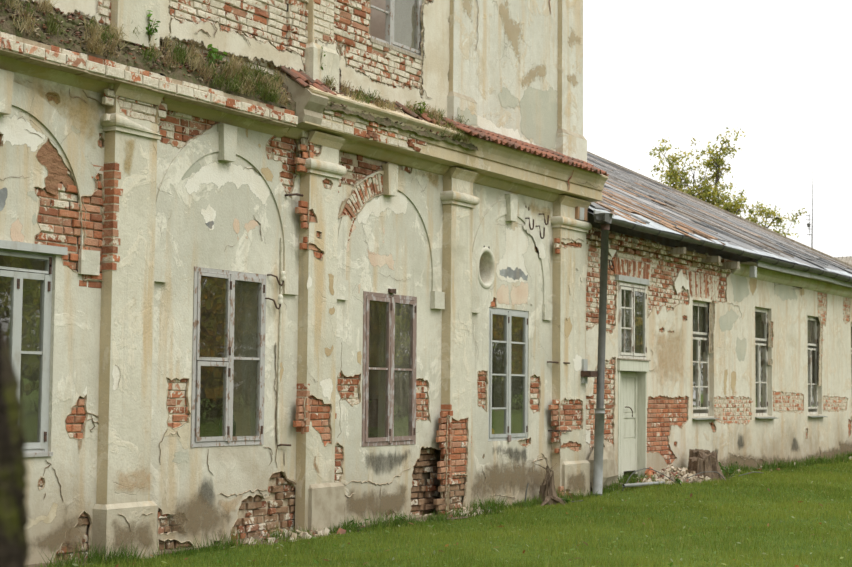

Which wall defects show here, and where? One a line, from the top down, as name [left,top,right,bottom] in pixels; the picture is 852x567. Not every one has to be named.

flaking render [160,0,309,76]
flaking render [333,0,424,101]
spalling [102,84,220,149]
spalling [0,114,123,288]
spalling [496,206,757,353]
spalling [65,386,88,440]
spalling [164,377,191,450]
spalling [293,351,362,482]
spalling [410,378,472,517]
spalling [529,354,616,453]
spalling [647,395,689,465]
spalling [230,471,296,540]